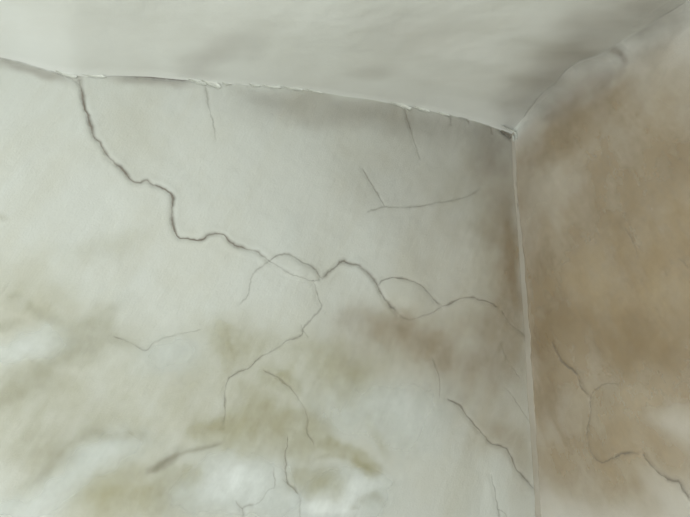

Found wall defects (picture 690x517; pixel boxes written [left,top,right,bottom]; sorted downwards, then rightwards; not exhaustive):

crack [81,89,245,249]
water stain [527,119,690,486]
water stain [180,457,384,517]